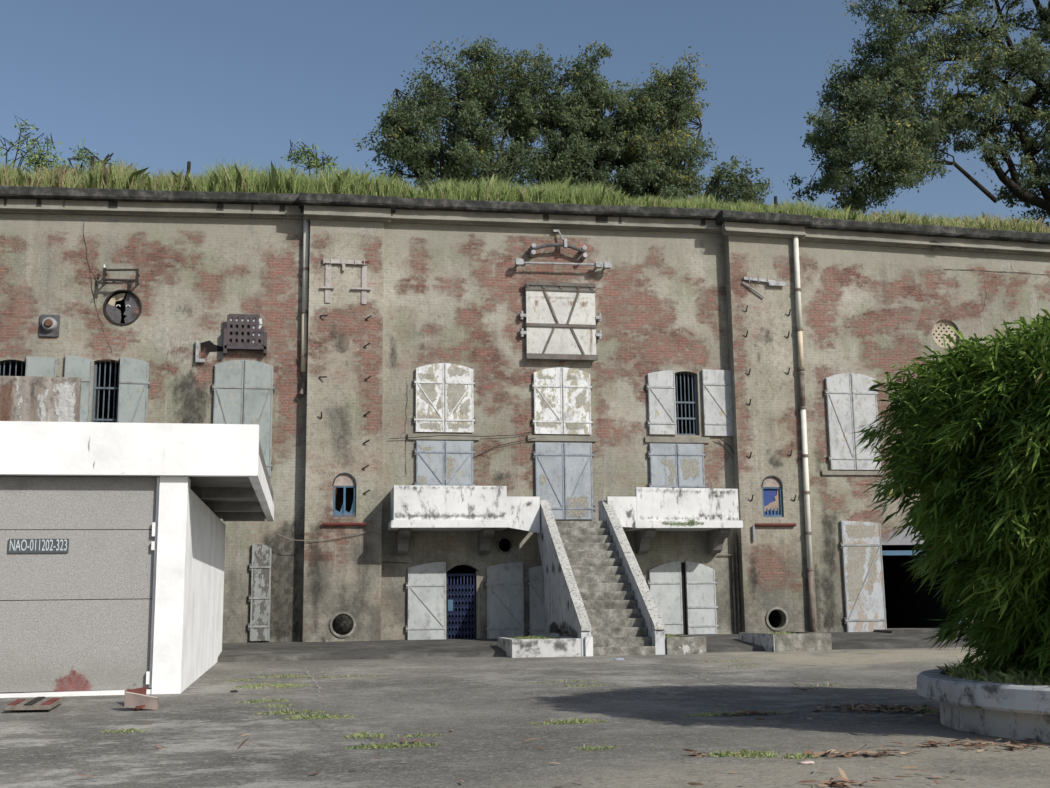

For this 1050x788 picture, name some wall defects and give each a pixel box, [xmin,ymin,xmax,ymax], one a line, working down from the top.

peeling [37,383,76,422]
leakage [175,374,206,424]
peeling [112,233,382,445]
peeling [399,234,753,489]
peeling [778,366,831,467]
peeling [807,266,1027,416]
peeling [845,449,897,602]